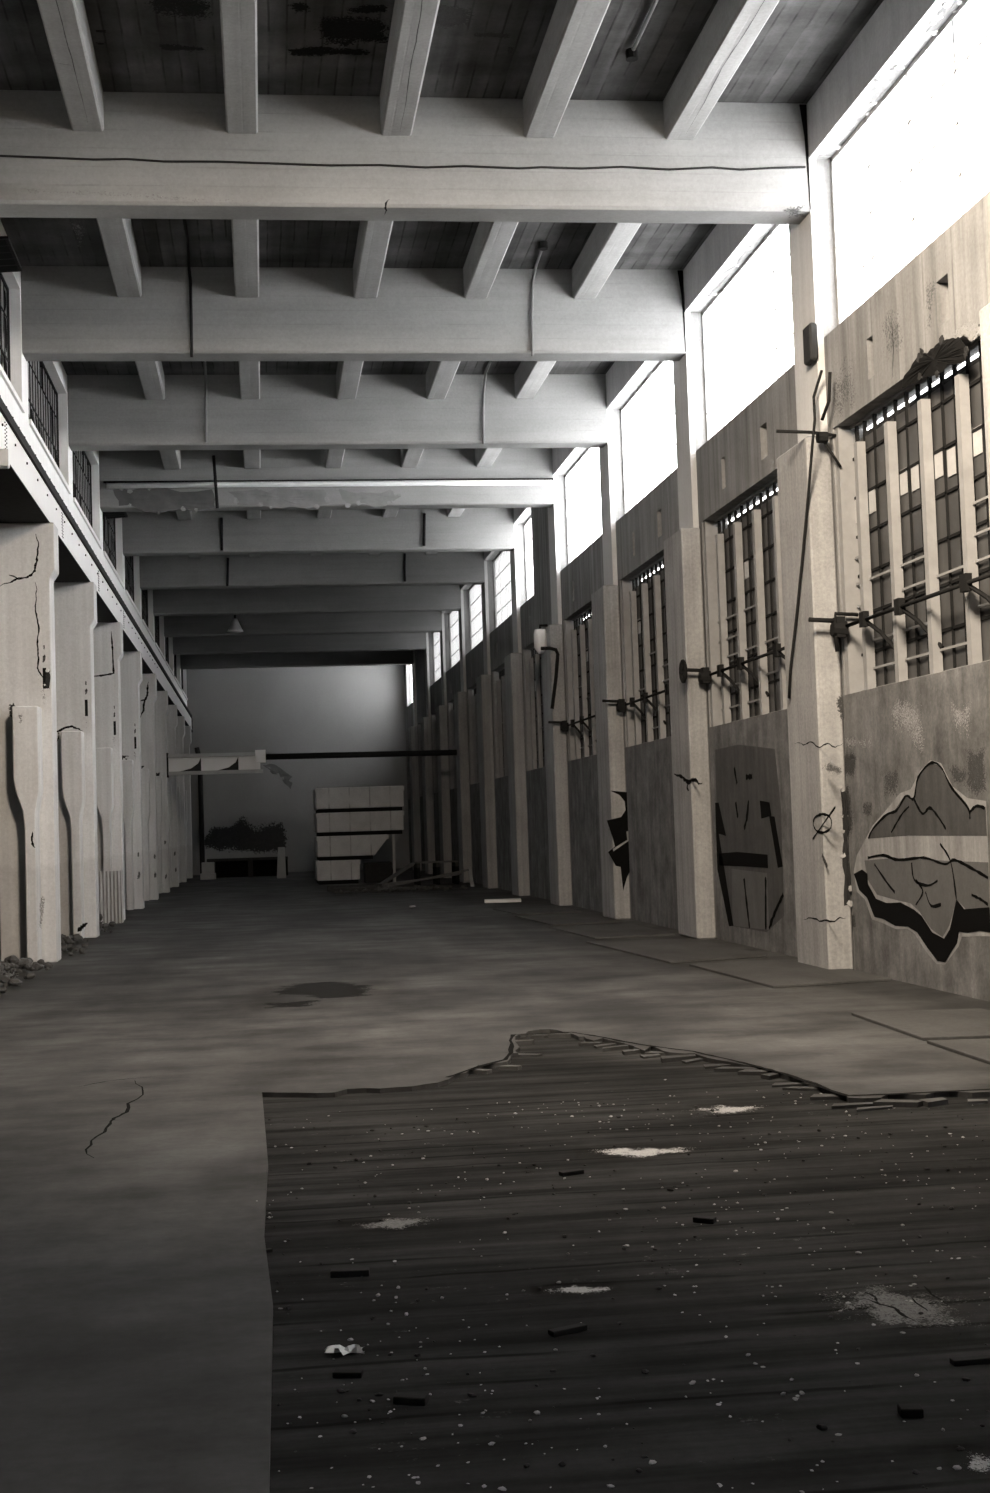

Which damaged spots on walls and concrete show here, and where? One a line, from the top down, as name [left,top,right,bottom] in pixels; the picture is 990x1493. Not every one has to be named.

crack [2,534,50,689]
crack [79,1077,144,1158]